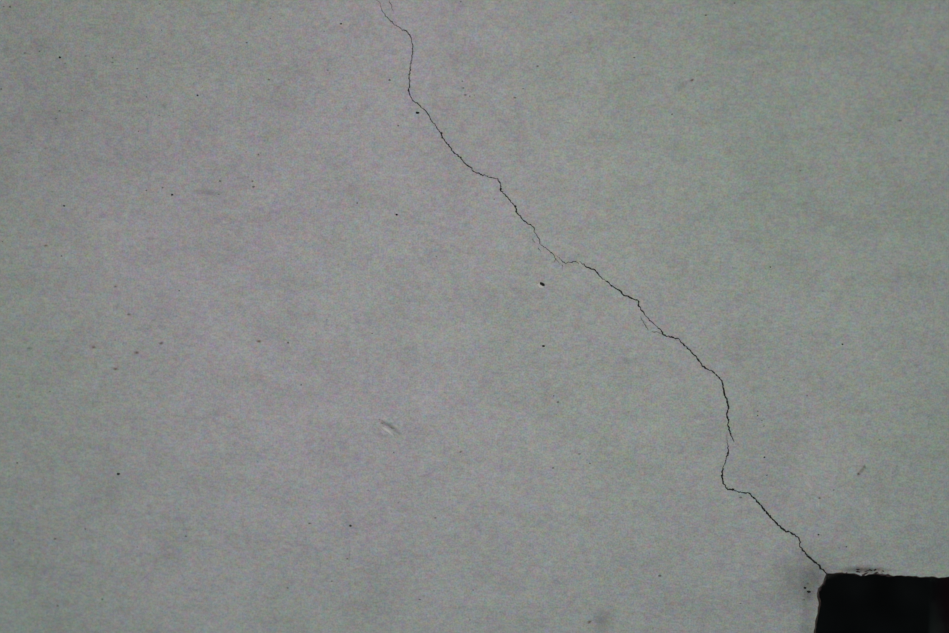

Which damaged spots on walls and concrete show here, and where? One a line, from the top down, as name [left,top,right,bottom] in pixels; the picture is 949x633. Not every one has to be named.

crack [378,1,828,575]